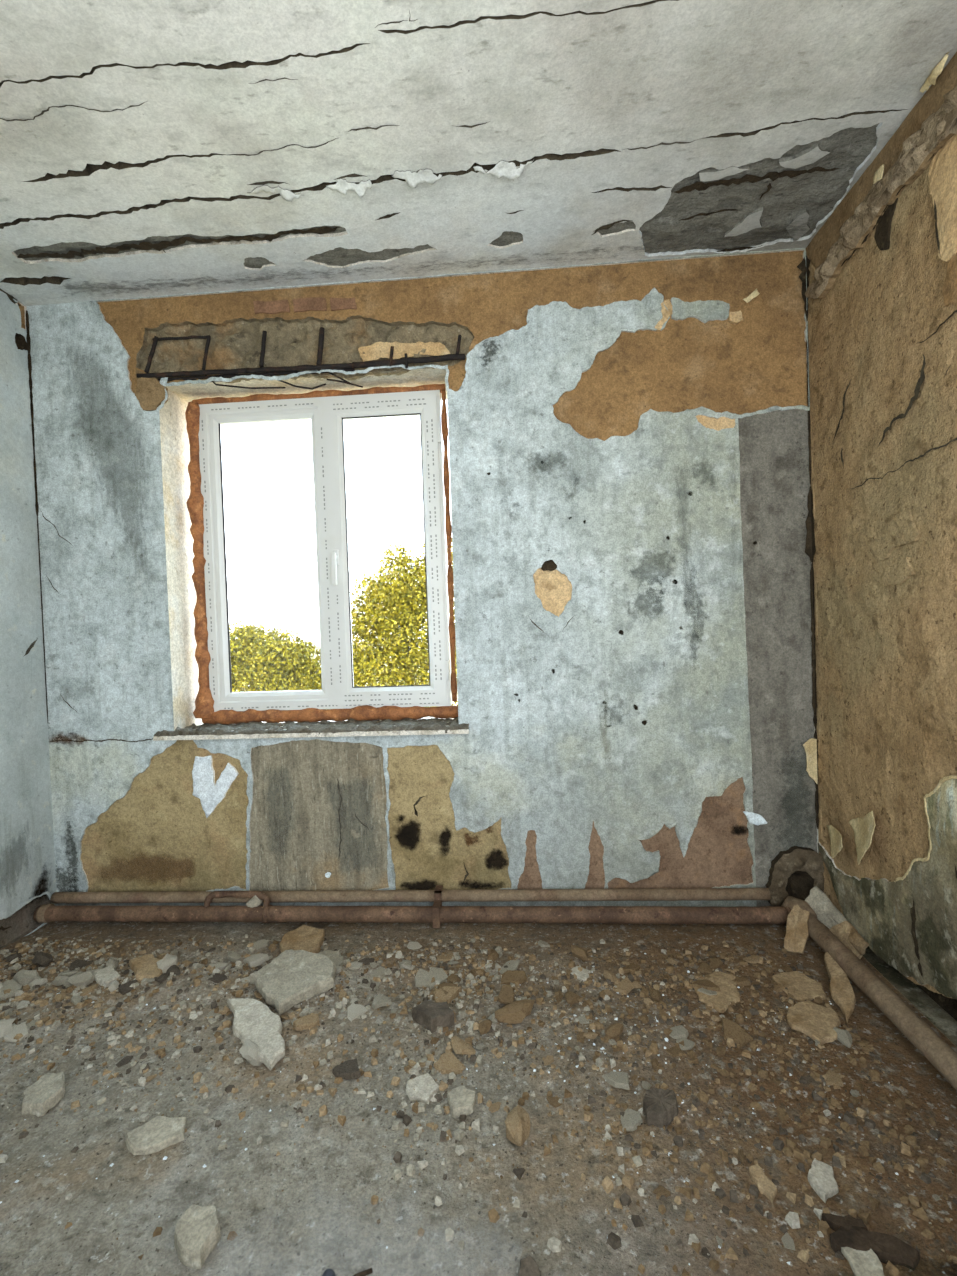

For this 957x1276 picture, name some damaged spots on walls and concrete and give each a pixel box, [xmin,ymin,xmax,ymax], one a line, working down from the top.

crack [0,0,679,121]
crack [0,109,908,229]
crack [933,199,941,257]
crack [0,276,153,742]
peeling [595,981,680,1094]